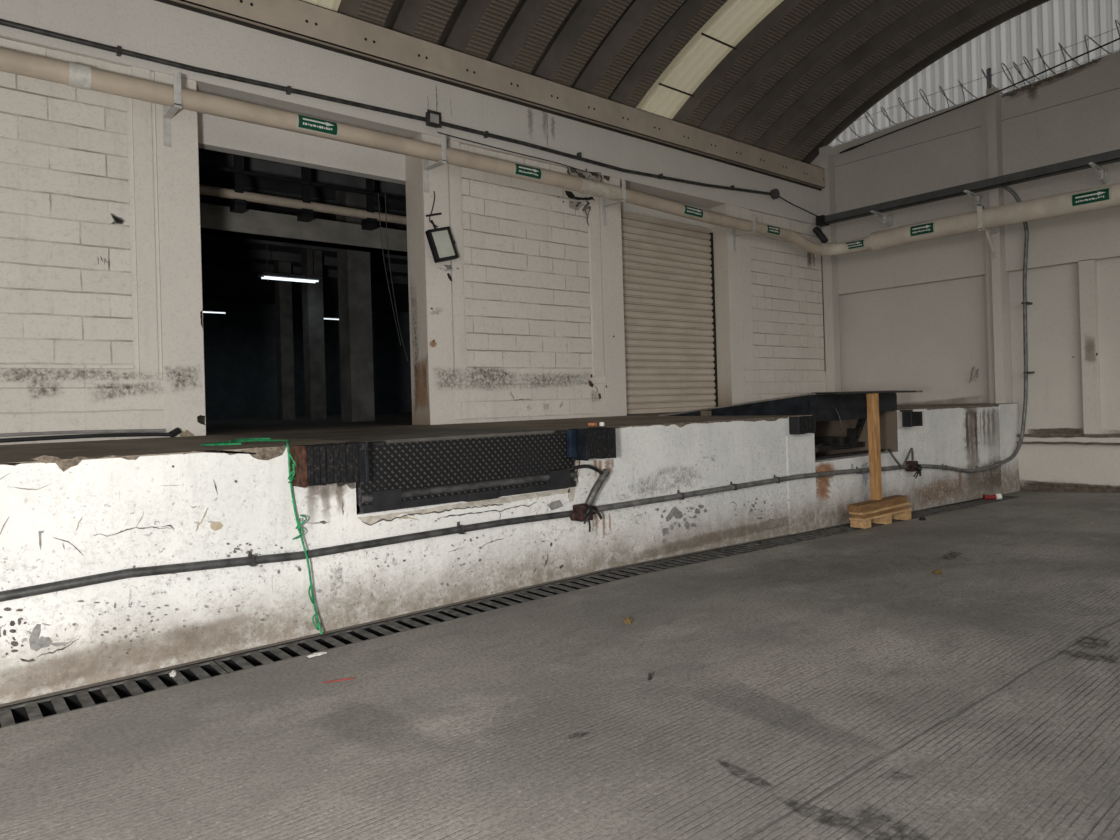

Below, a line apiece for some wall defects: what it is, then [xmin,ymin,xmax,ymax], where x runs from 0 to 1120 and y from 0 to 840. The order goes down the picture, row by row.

water stain [8,369,143,397]
spalling [0,455,141,472]
spalling [183,445,285,460]
spalling [357,460,580,526]
corrosion [815,464,833,497]
water stain [926,411,1001,495]
peeling [656,496,707,544]
peeling [0,607,78,662]
spalling [100,605,197,654]